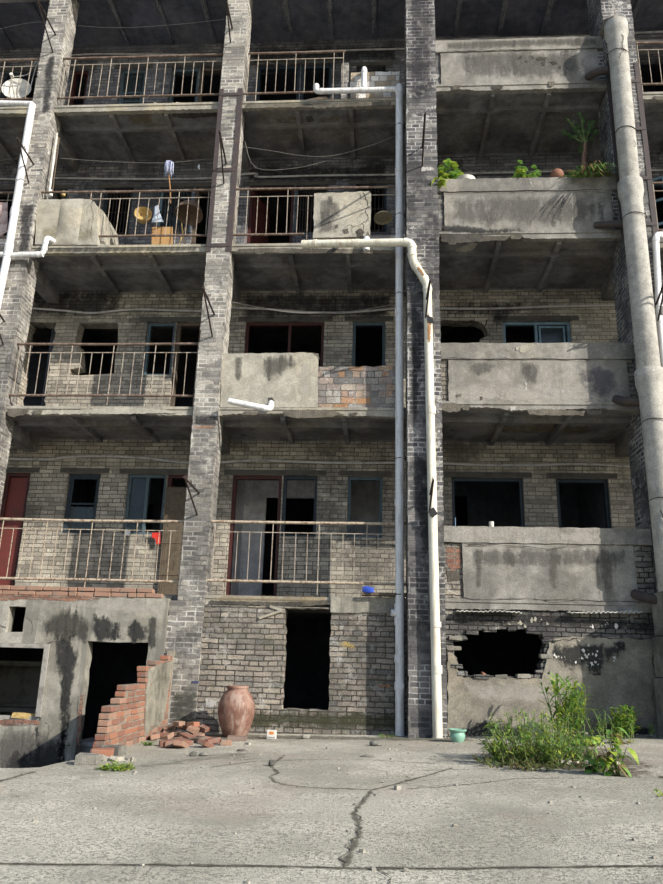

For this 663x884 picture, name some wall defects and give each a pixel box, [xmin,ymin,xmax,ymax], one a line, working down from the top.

water stain [320,196,338,232]
water stain [265,355,311,395]
water stain [461,364,582,410]
water stain [580,367,614,398]
water stain [475,533,624,591]
spalling [446,617,600,667]
water stain [0,602,159,768]
spalling [451,663,550,679]
crack [0,755,663,884]